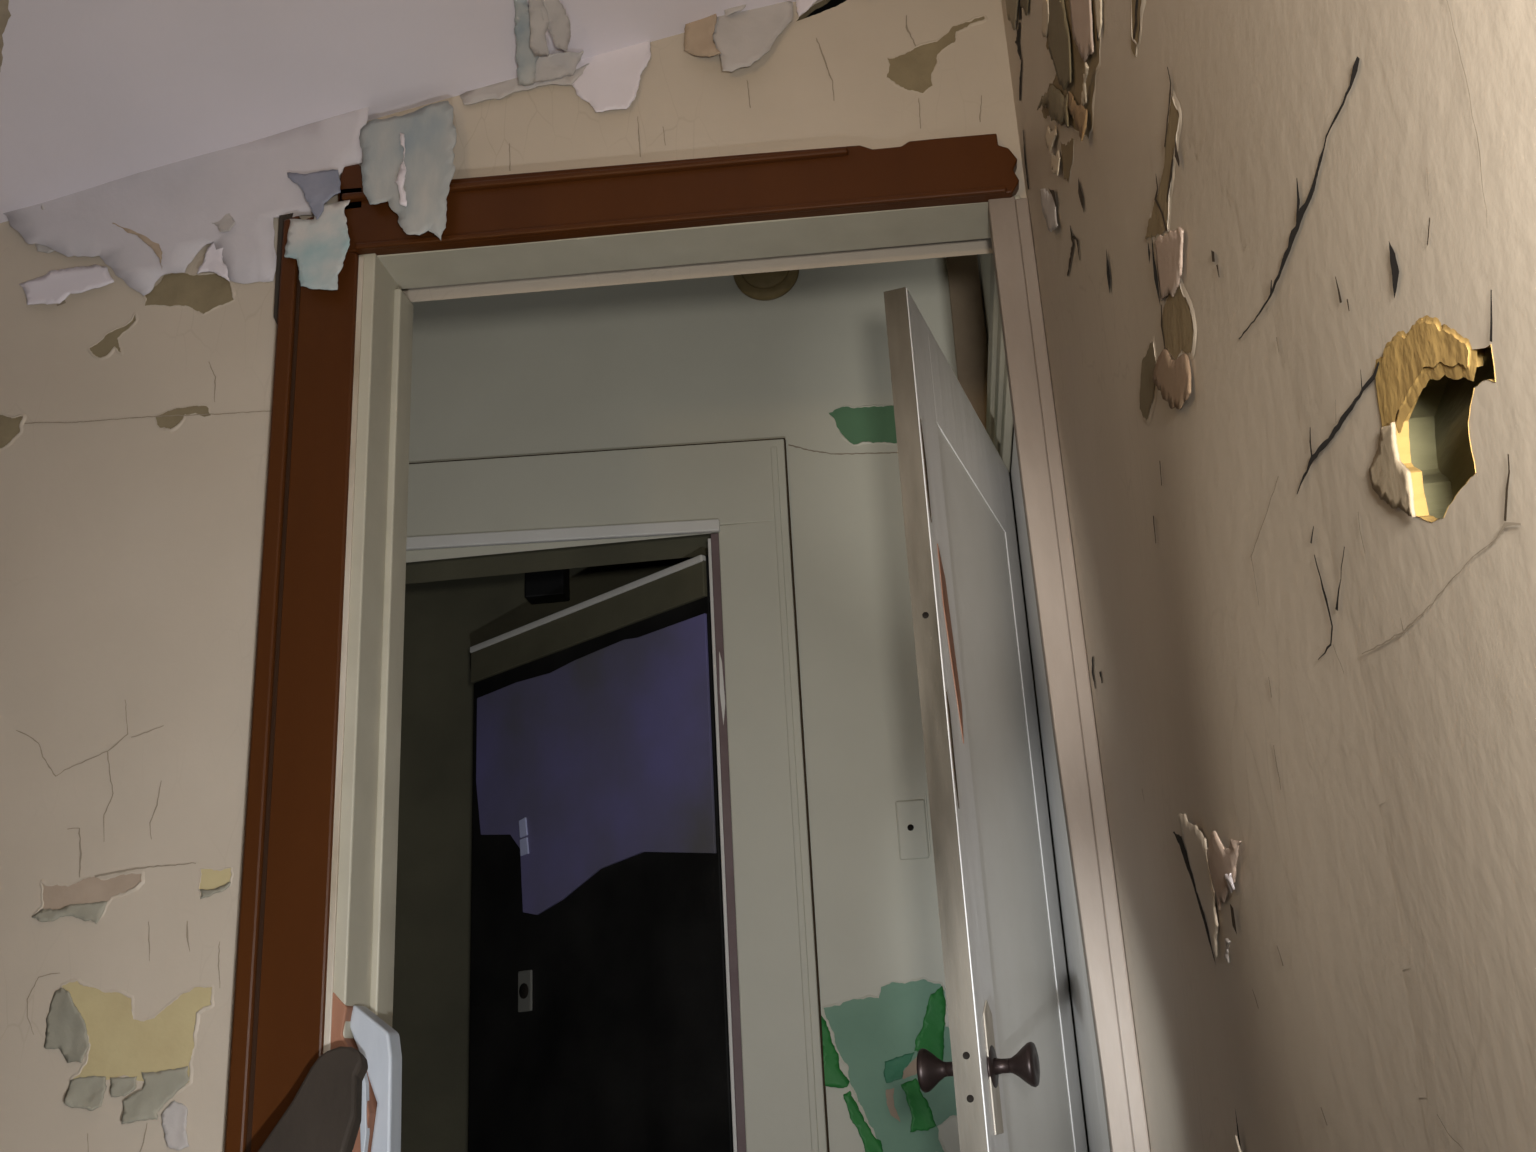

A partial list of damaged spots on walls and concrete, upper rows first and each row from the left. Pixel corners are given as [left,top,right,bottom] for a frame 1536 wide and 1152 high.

peeling [684,0,846,72]
peeling [1005,0,1102,232]
peeling [1140,67,1197,426]
crack [1239,57,1360,352]
peeling [0,0,651,1054]
peeling [827,404,897,446]
crack [1251,362,1521,673]
spalling [1369,290,1496,522]
crack [16,701,164,877]
peeling [1173,813,1241,964]
peeling [44,978,215,1151]
peeling [821,977,957,1152]